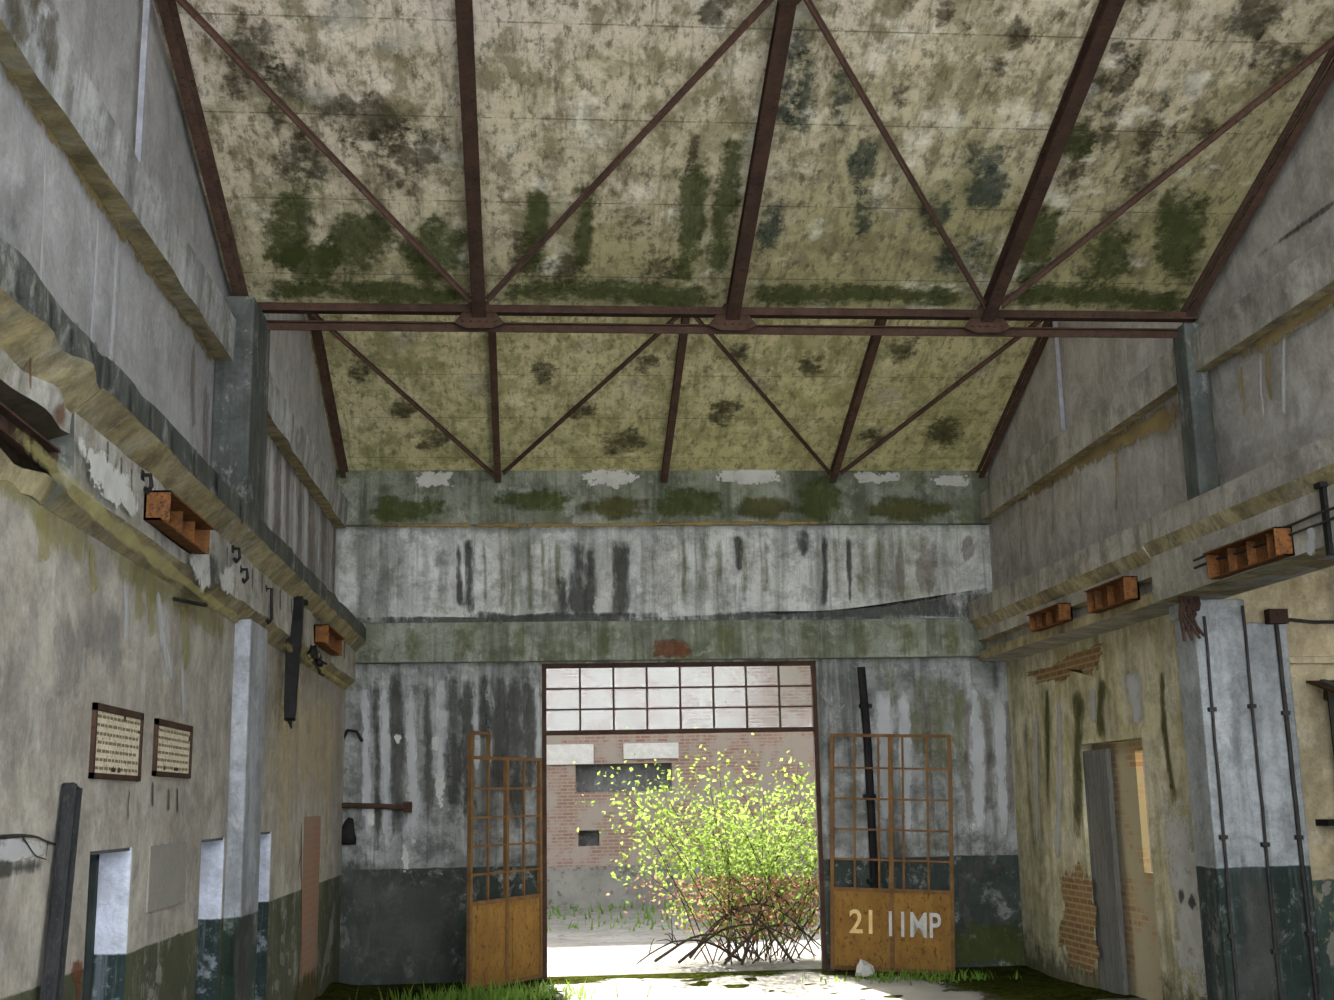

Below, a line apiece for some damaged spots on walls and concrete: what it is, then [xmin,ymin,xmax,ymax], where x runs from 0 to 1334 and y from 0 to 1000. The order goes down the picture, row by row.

leakage [502,136,742,307]
leakage [753,138,1011,307]
leakage [1004,188,1210,312]
leakage [613,545,630,615]
peeling [366,809,375,829]
peeling [431,735,440,751]
peeling [434,773,446,808]
leakage [360,676,541,844]
leakage [970,690,1016,829]
spalling [1059,862,1100,979]
peeling [1162,788,1207,999]
peeling [533,971,994,1000]